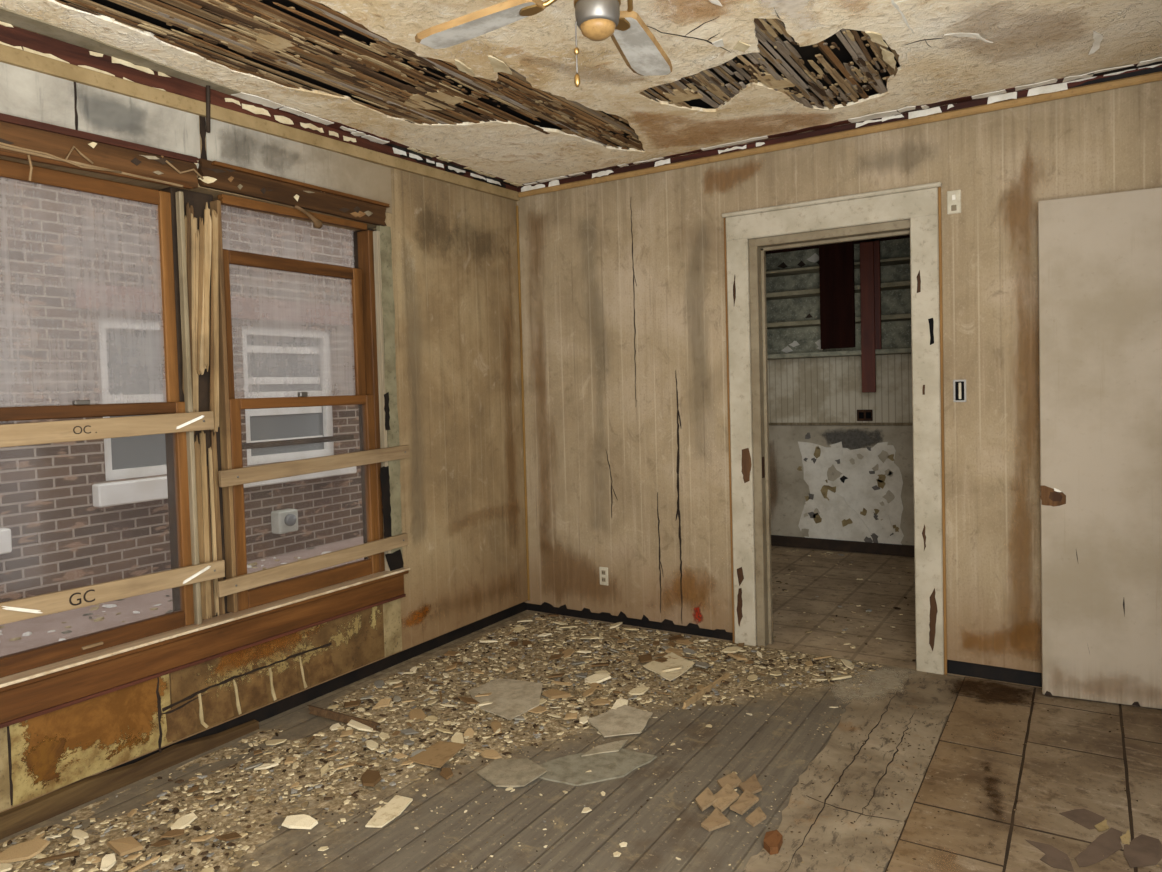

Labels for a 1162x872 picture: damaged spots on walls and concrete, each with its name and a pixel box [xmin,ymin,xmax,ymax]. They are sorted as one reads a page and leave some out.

peeling [0,41,169,91]
flaking render [55,0,670,192]
flaking render [639,18,954,128]
peeling [972,57,1162,104]
peeling [701,136,768,154]
peeling [797,432,904,545]
peeling [929,588,938,651]